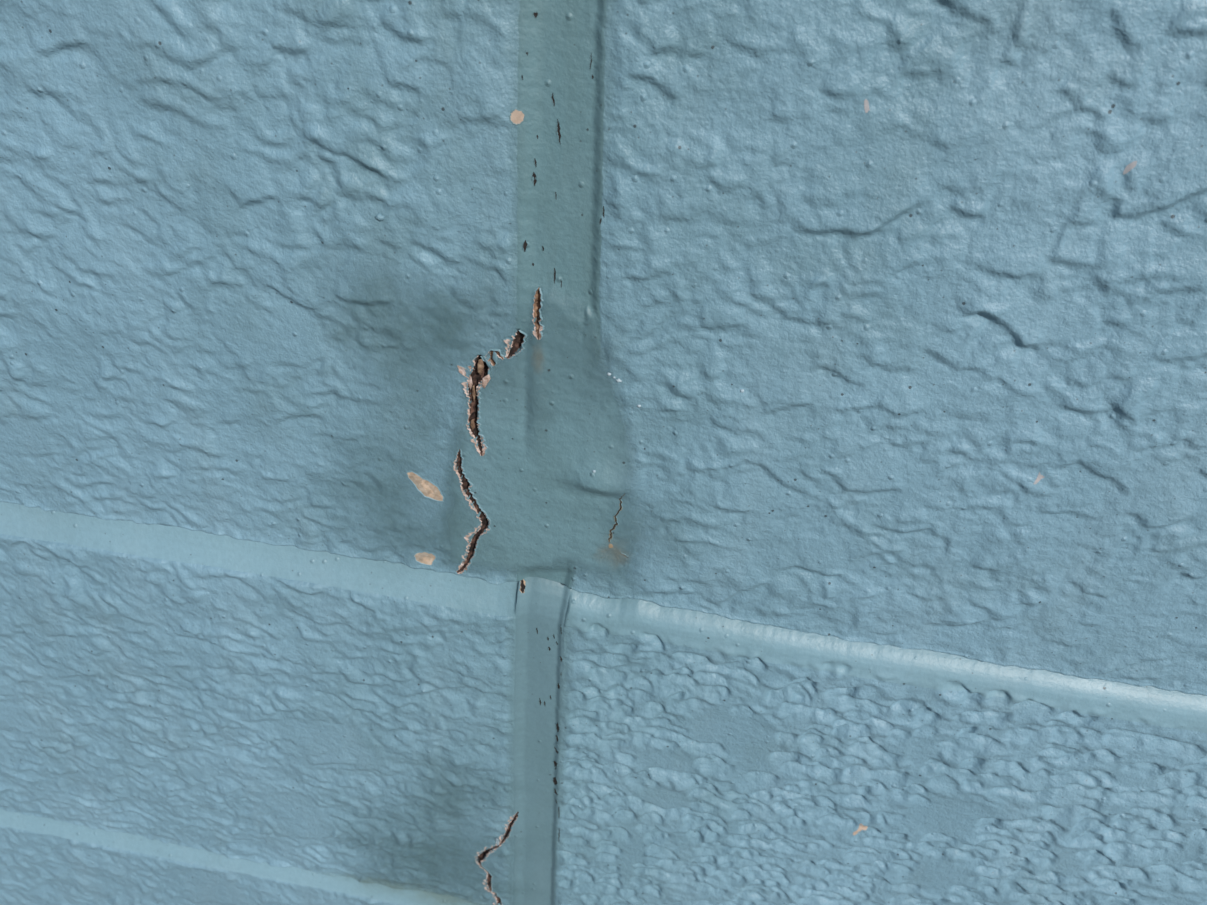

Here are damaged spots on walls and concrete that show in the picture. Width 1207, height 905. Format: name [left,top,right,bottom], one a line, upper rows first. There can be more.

crack [531,93,562,199]
crack [452,240,562,574]
crack [474,812,520,905]